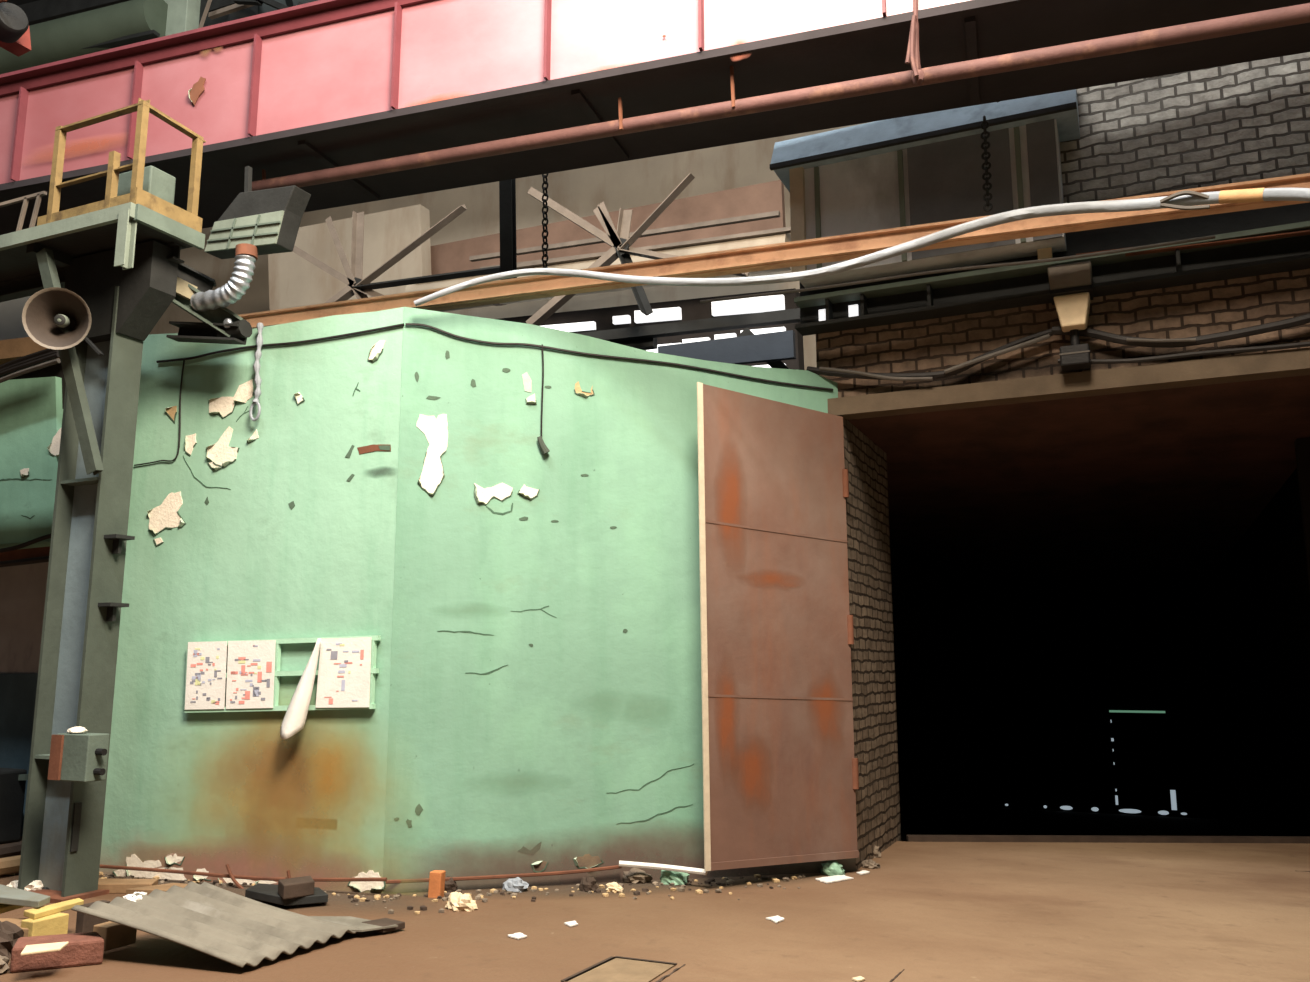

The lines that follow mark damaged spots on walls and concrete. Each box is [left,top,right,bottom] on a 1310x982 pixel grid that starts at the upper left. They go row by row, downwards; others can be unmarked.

peeling [165,406,177,423]
peeling [185,379,259,471]
peeling [416,396,448,497]
peeling [147,491,186,546]
peeling [474,483,540,505]
crack [441,628,491,636]
corrosion [225,734,338,863]
crack [609,764,693,824]